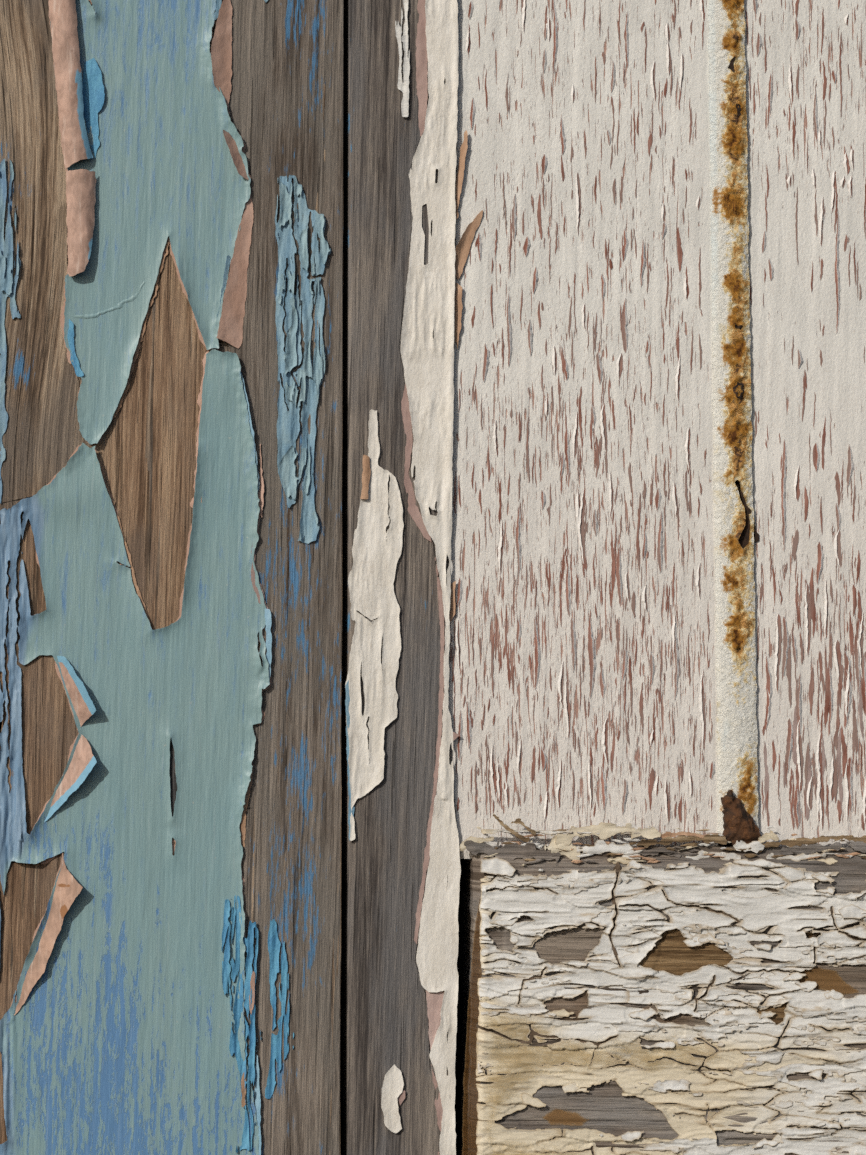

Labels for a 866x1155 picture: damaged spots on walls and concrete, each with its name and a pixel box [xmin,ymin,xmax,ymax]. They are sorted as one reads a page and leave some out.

rust [720,0,746,156]
rust [712,187,743,221]
rust [717,272,749,460]
peeling [0,0,459,1155]
rust [721,566,744,649]
peeling [534,922,606,964]
crack [608,862,621,967]
peeling [639,929,732,976]
crack [662,890,740,923]
crack [813,907,866,963]
crack [476,1024,618,1064]
peeling [495,1080,679,1141]